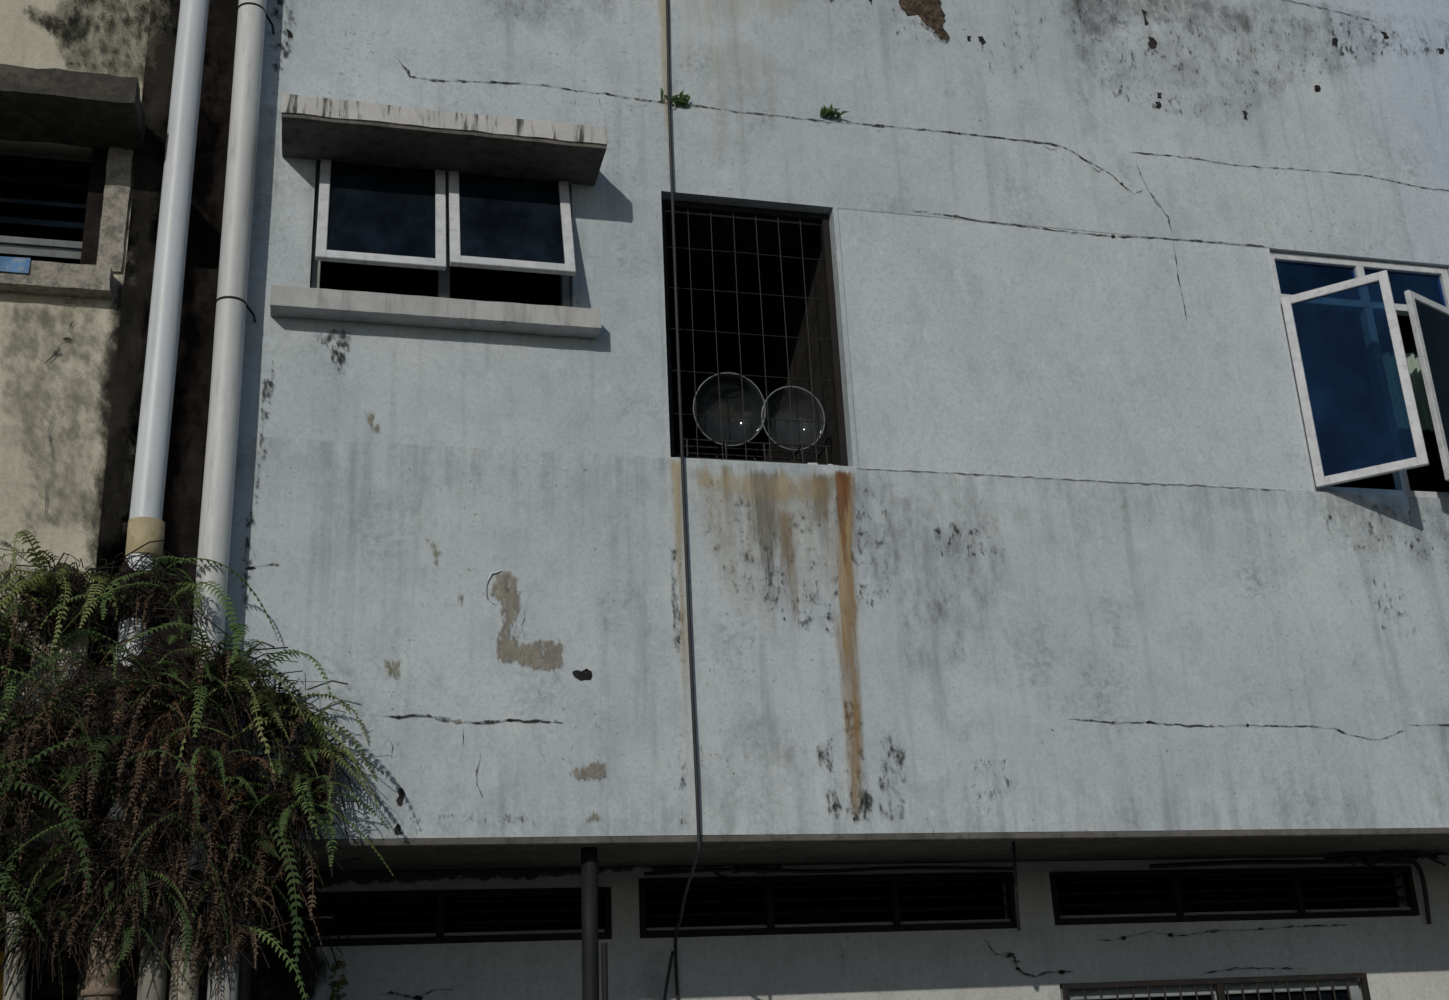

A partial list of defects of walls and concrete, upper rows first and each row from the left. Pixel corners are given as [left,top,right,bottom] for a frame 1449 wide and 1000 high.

spalling [898,0,950,44]
leakage [1212,12,1448,103]
crack [1285,0,1381,23]
crack [398,59,1449,321]
leakage [4,0,179,563]
peeling [485,570,592,681]
corrosion [812,471,861,813]
crack [389,714,563,797]
crack [1075,719,1449,740]
crack [985,940,1073,977]
crack [1099,924,1359,941]
crack [1206,966,1295,974]